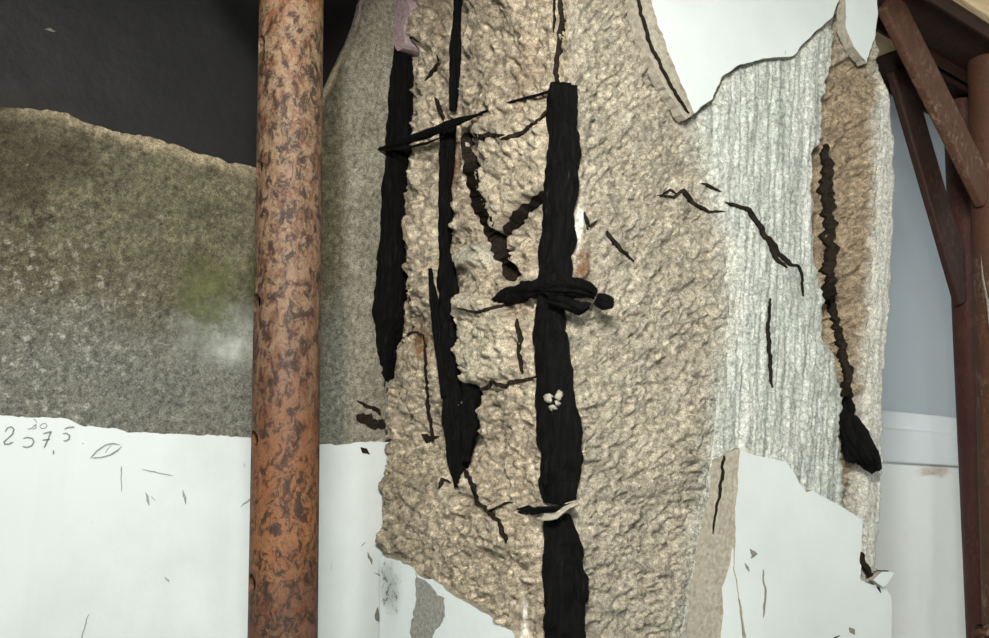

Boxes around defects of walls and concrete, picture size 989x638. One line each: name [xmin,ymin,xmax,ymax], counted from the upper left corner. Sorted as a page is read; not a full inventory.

crack [552,0,567,82]
crack [636,0,690,113]
spalling [0,107,256,438]
damp [204,324,253,362]
crack [407,331,434,443]
crack [409,36,547,391]
spalling [320,0,881,638]
crack [583,212,635,262]
crack [657,143,854,398]
crack [438,468,513,544]
crack [712,455,726,534]
peeling [867,571,895,587]